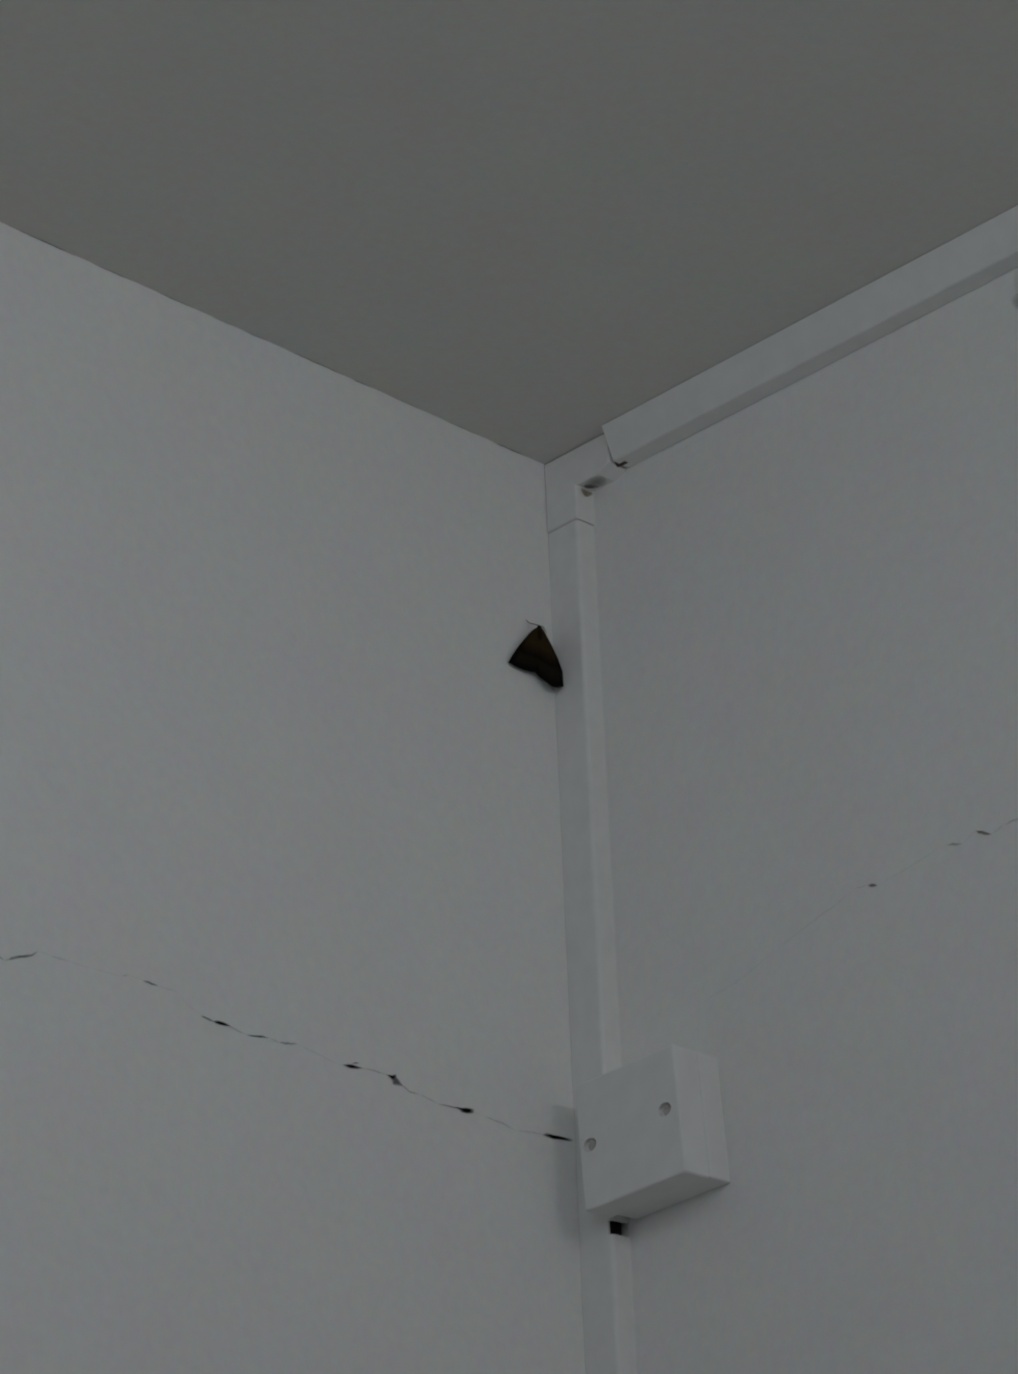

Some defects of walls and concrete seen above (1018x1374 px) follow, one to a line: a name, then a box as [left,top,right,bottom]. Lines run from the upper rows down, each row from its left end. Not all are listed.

crack [203,1016,288,1044]
crack [345,1062,401,1085]
crack [455,1106,473,1114]
crack [546,1133,569,1141]